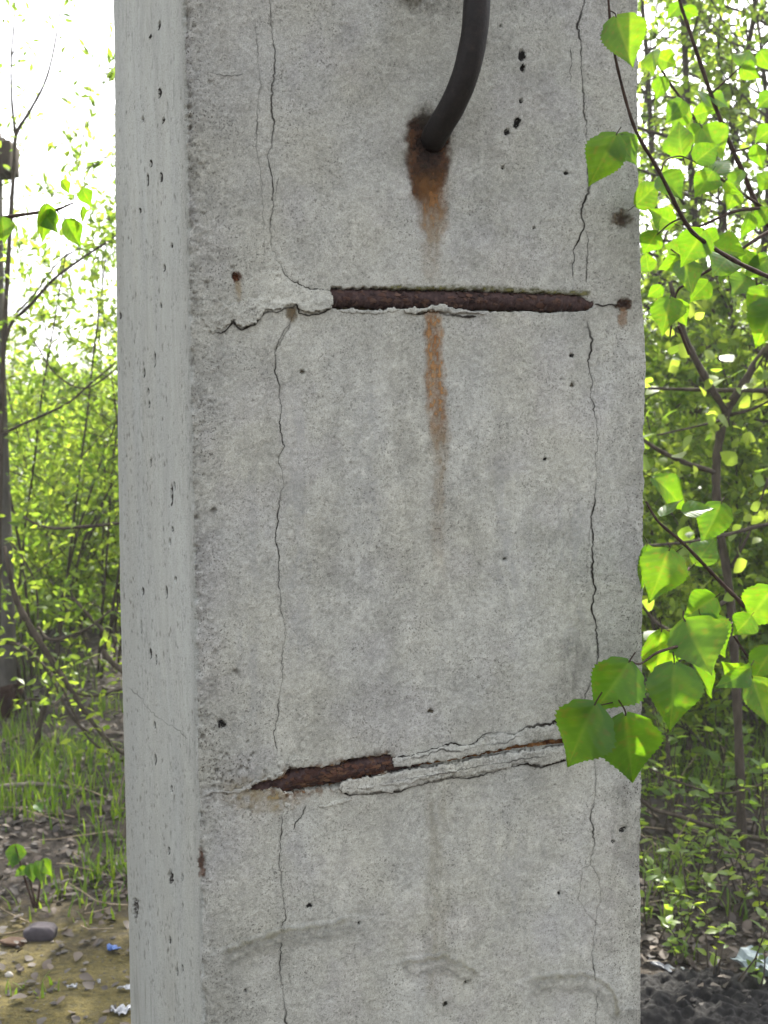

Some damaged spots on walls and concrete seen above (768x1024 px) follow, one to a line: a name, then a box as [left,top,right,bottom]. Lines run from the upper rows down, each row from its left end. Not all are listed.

crack [256,4,276,223]
crack [569,0,587,126]
rust [405,114,450,237]
crack [572,168,590,280]
spalling [201,271,593,334]
crack [274,340,285,464]
rust [425,315,447,423]
crack [587,330,599,450]
crack [274,504,282,595]
crack [584,495,599,699]
peeling [202,724,566,810]